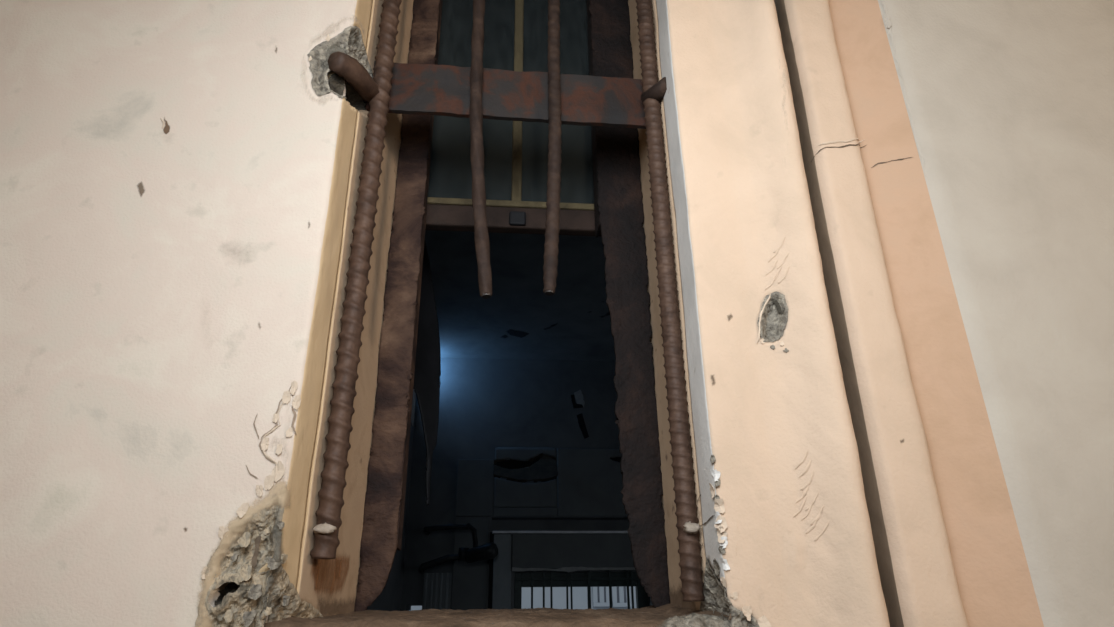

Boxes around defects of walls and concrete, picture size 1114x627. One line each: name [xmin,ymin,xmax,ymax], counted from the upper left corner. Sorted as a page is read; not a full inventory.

spalling [307,26,374,111]
crack [811,138,912,167]
spalling [757,291,789,353]
spalling [195,380,323,627]
spalling [662,455,771,627]